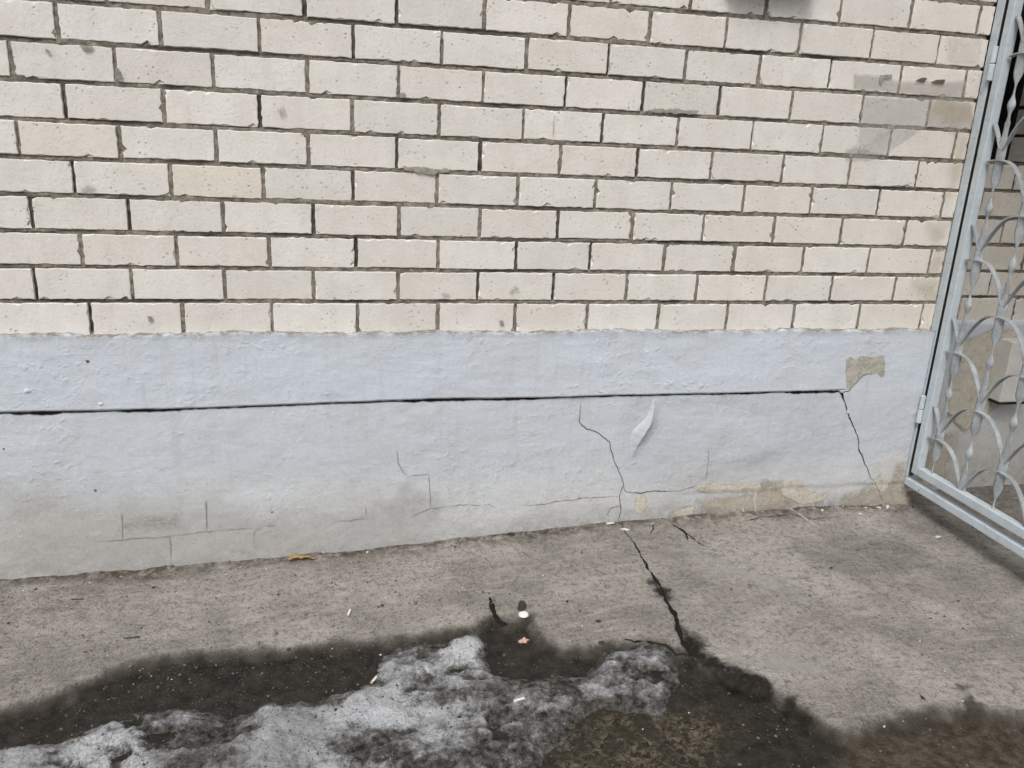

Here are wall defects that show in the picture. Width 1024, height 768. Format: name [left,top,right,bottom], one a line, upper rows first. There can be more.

peeling [844,354,886,391]
crack [0,373,879,656]
spalling [674,479,827,517]